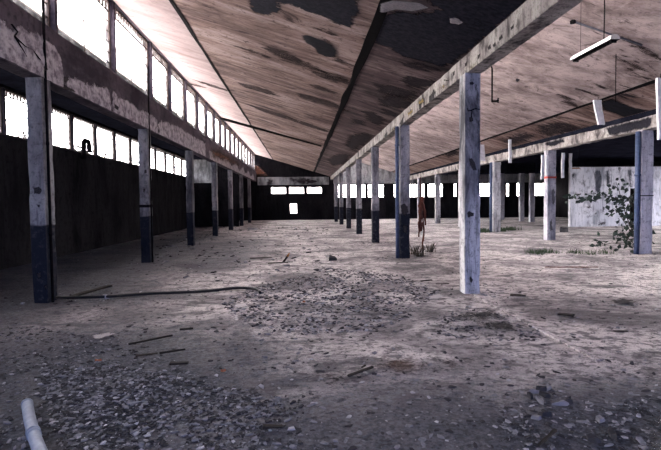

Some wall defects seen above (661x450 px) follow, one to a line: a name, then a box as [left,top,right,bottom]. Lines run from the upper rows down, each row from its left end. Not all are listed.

crack [11,24,41,60]
leakage [302,27,352,66]
leakage [233,45,357,86]
peeling [0,19,266,180]
leakage [240,83,281,97]
leakage [297,84,348,112]
leakage [247,104,329,132]